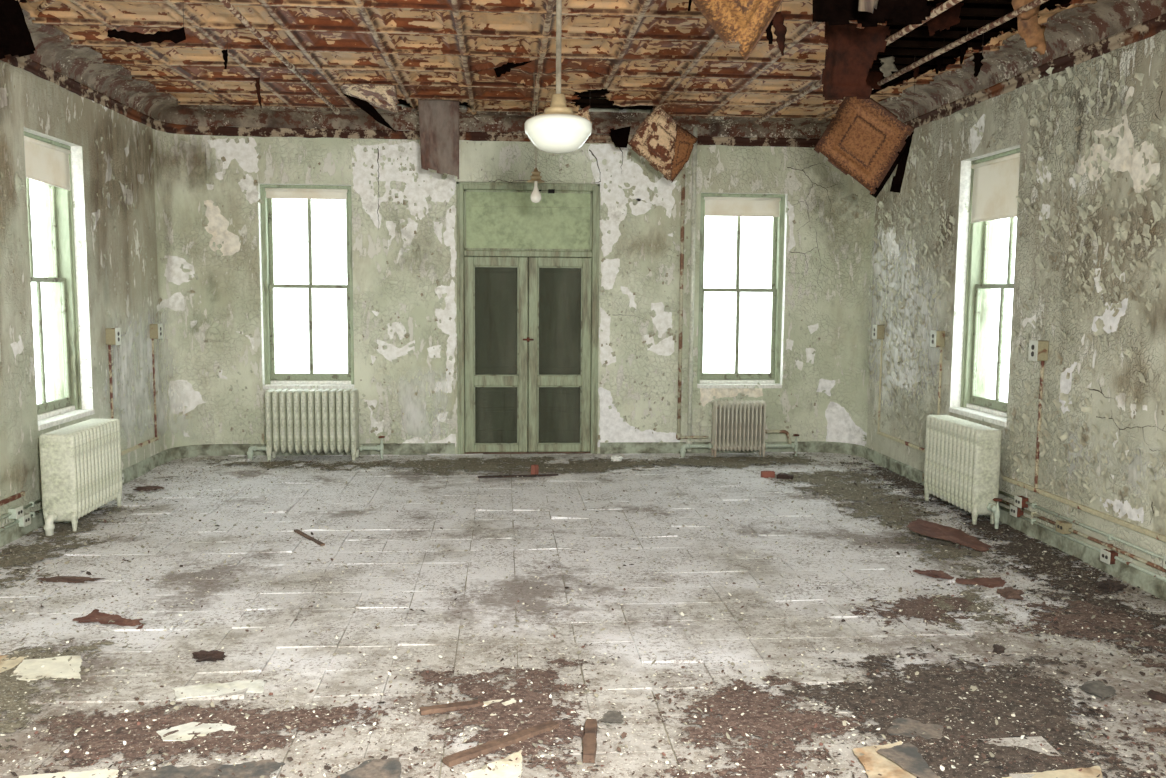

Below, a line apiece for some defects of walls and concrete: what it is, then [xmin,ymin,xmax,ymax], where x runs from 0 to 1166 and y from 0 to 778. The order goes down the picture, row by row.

peeling [970,114,985,153]
peeling [1069,86,1160,196]
peeling [201,135,264,257]
peeling [1029,156,1051,220]
peeling [352,141,457,395]
peeling [588,144,680,356]
peeling [872,223,916,303]
peeling [10,331,25,357]
peeling [599,307,616,368]
peeling [363,399,384,436]
peeling [397,434,457,447]
peeling [598,387,680,447]